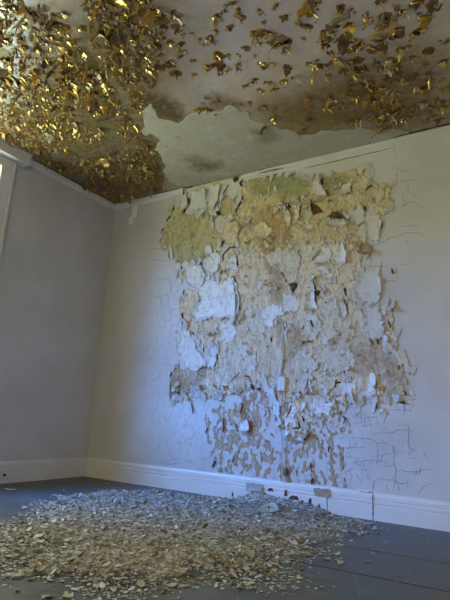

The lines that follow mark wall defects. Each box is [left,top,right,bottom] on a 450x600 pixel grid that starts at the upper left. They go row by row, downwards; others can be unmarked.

peeling [0,0,450,205]
damp [273,63,445,133]
flaking render [158,161,417,487]
peeling [246,483,274,493]
crack [338,398,435,515]